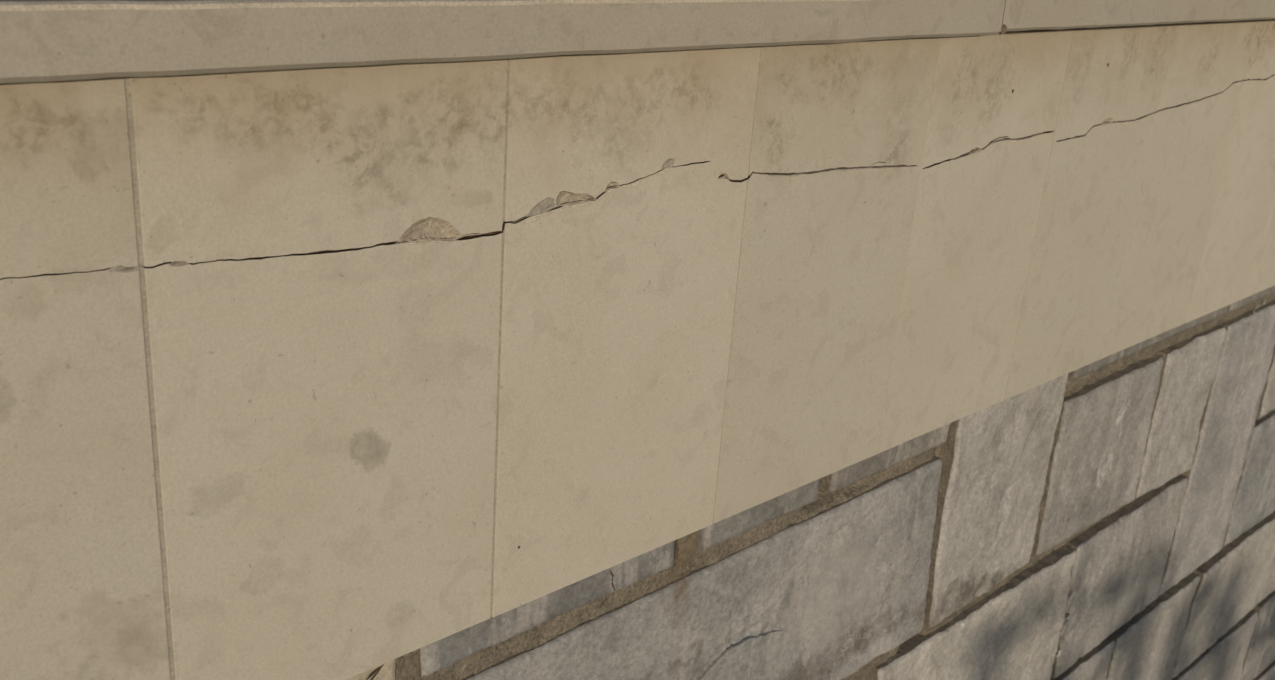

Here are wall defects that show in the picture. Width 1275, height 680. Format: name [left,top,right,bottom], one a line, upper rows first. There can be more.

crack [0,74,1275,280]